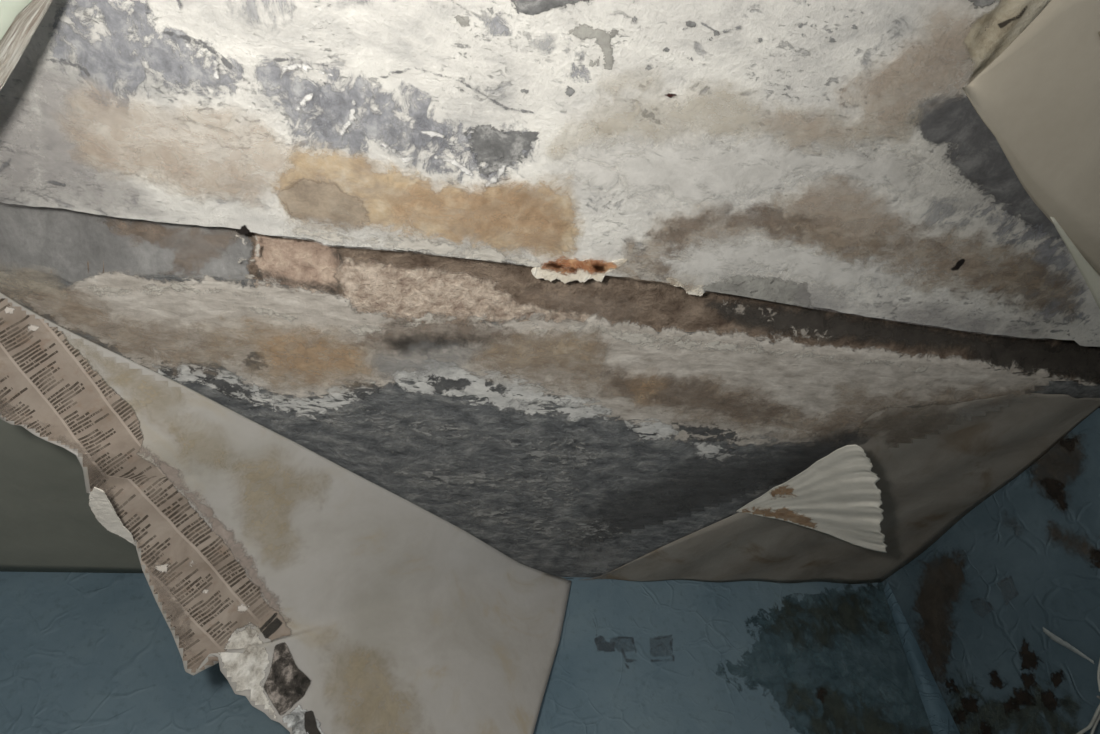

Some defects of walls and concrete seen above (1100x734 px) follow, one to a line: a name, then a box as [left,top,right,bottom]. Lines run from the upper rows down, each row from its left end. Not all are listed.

peeling [50,0,539,187]
flaking render [511,0,589,15]
peeling [565,24,619,97]
water stain [135,129,579,256]
water stain [616,15,1088,324]
corrosion [531,256,627,284]
water stain [707,299,1100,384]
peeling [89,487,136,546]
water stain [0,273,1036,553]
water stain [1031,436,1084,510]
water stain [716,582,933,734]
water stain [916,552,1079,734]